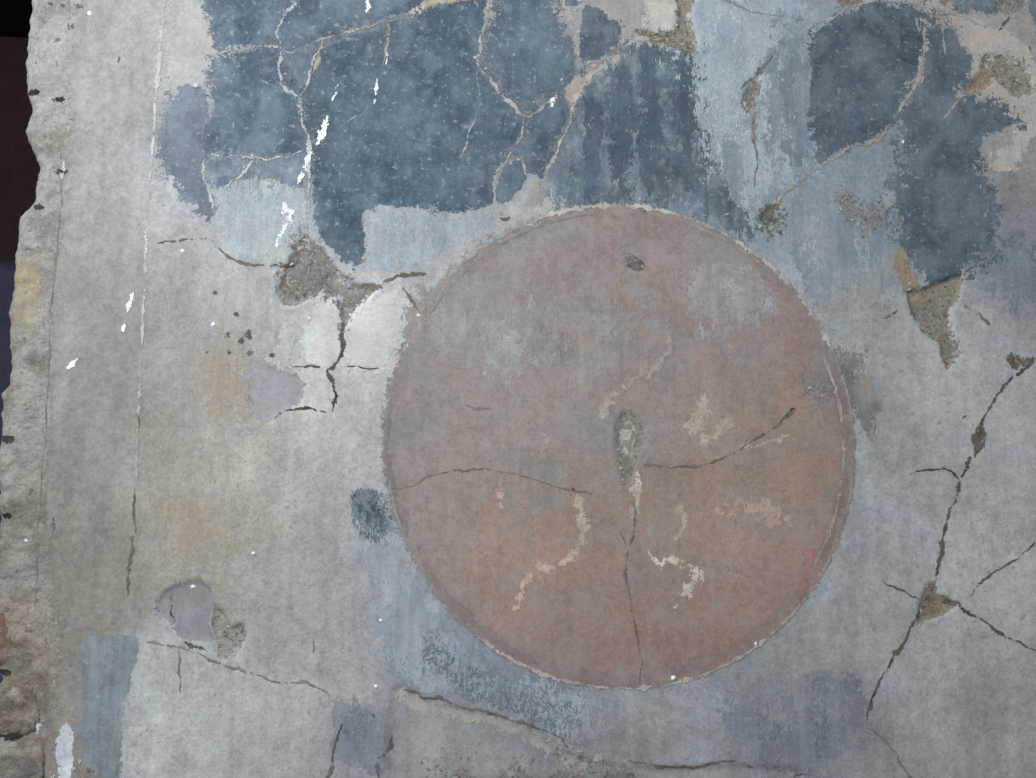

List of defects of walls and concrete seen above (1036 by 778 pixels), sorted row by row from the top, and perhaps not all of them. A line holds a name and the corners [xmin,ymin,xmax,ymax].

crack [158,0,696,269]
peeling [152,0,788,422]
crack [724,0,1010,219]
peeling [794,0,1036,369]
spalling [0,0,101,778]
peeling [151,576,247,660]
crack [146,641,329,695]
crack [326,724,342,778]
peeling [391,686,657,778]
flaking render [614,410,646,487]
crack [620,408,796,684]
crack [866,352,1035,778]